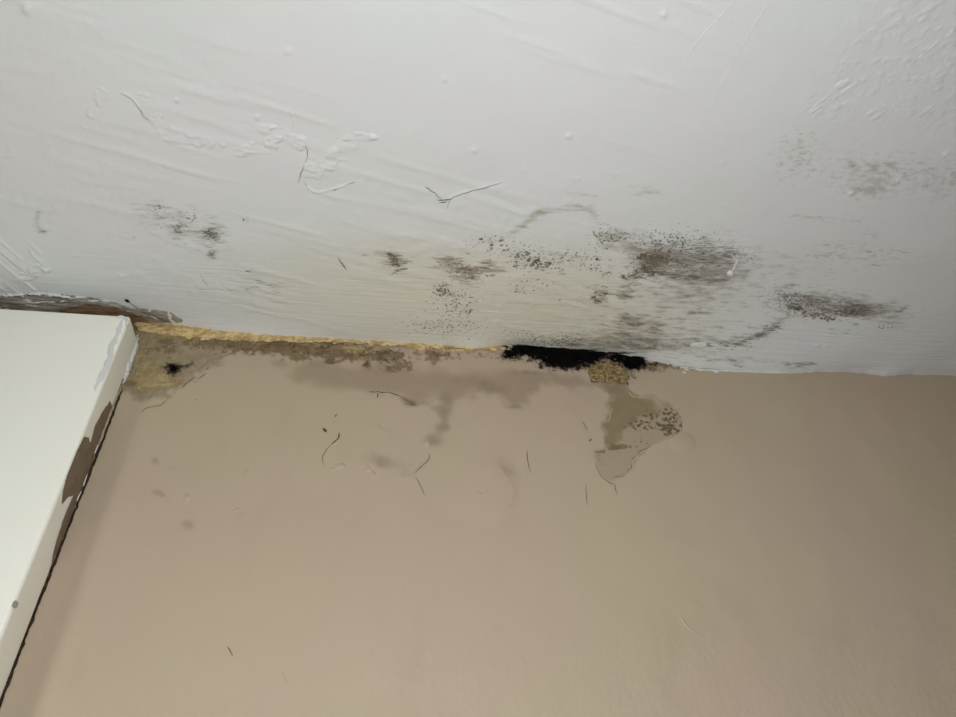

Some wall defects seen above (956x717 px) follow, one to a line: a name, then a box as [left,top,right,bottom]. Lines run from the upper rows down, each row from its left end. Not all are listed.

crack [427,180,504,209]
mould [407,223,752,340]
water stain [501,292,901,371]
flaking render [588,361,684,452]
peeling [52,401,112,564]